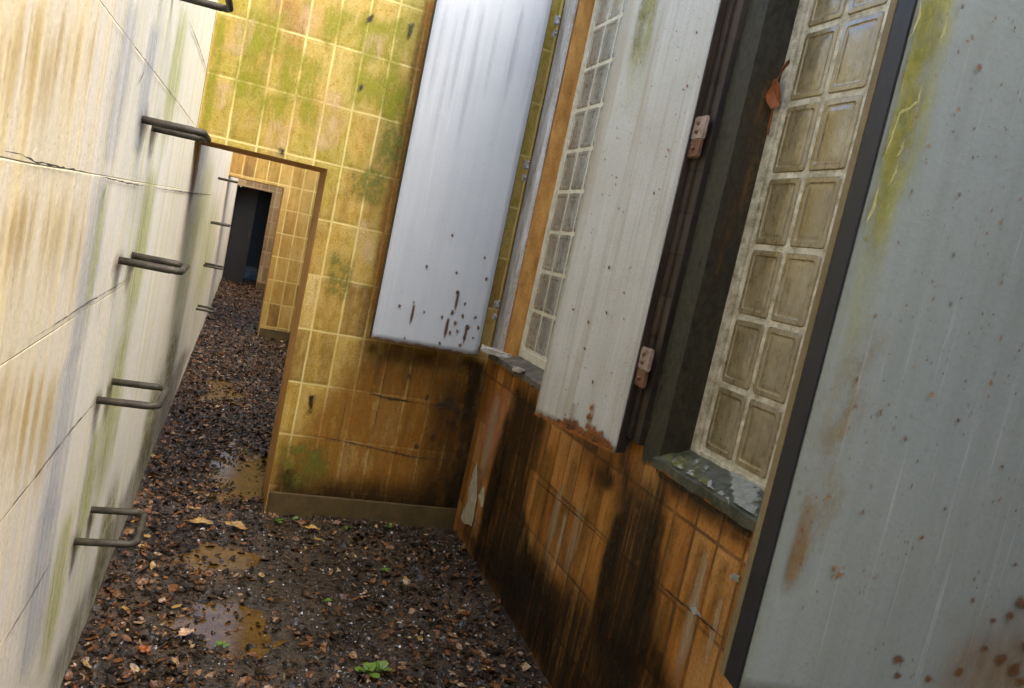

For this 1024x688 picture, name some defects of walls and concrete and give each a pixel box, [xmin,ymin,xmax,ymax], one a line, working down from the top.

crack [5,151,81,171]
crack [102,177,211,207]
rust [372,290,480,356]
damp [284,0,800,688]
rust [533,403,613,453]
damp [25,347,126,657]
peeling [460,463,484,526]
rust [982,646,1024,686]